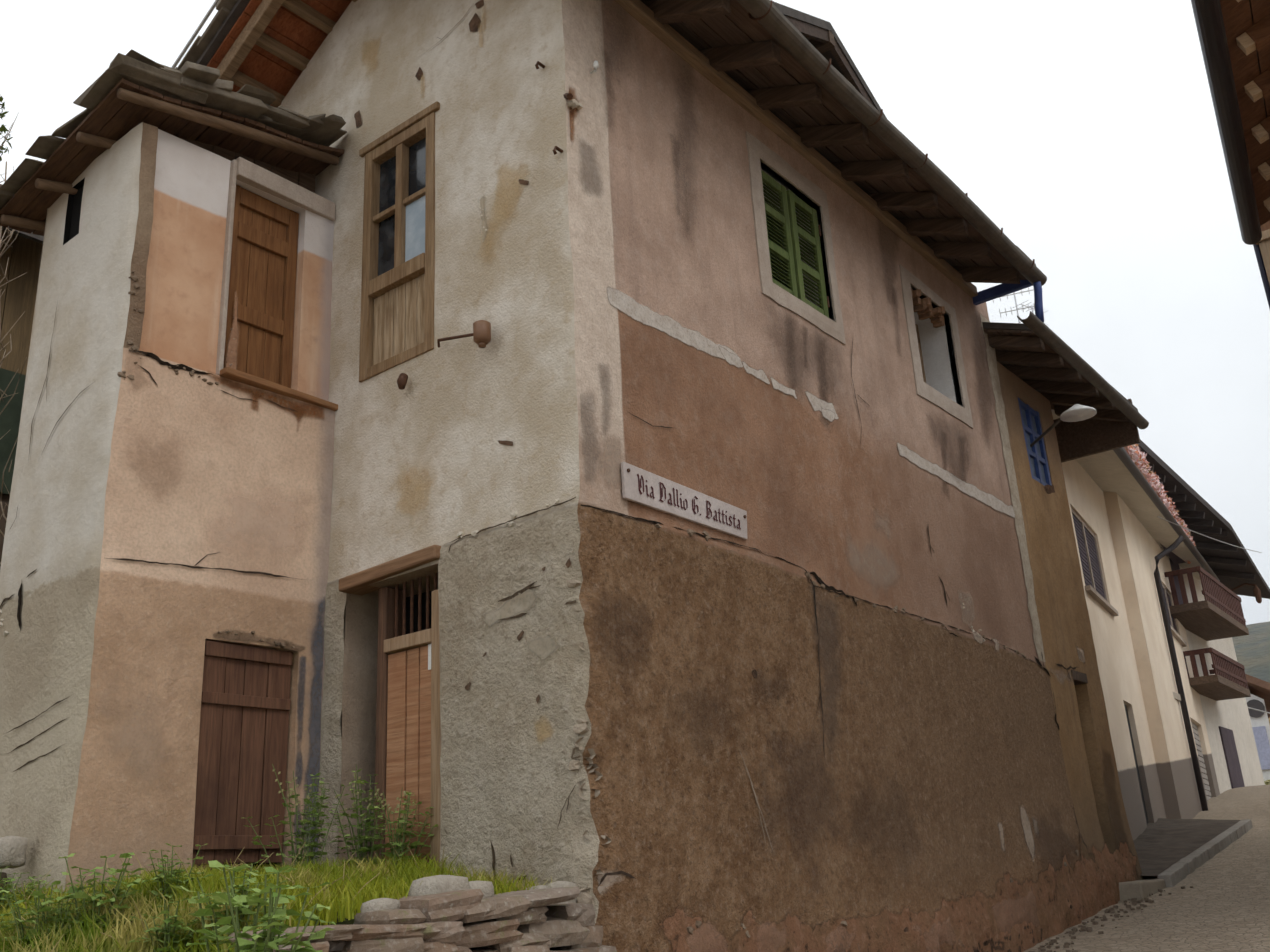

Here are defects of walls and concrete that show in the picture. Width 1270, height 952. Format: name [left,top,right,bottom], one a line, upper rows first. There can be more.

crack [129,349,298,412]
crack [106,552,306,580]
crack [449,497,1079,757]
spalling [568,720,603,800]
spalling [576,870,618,905]